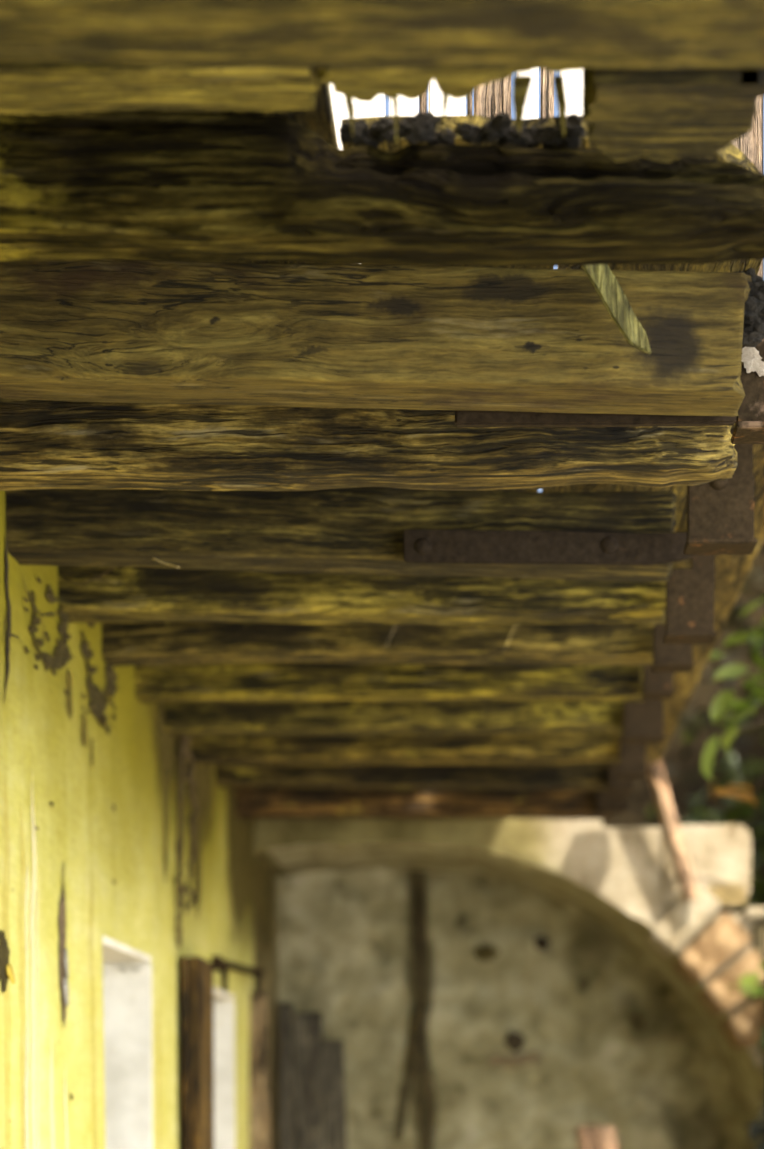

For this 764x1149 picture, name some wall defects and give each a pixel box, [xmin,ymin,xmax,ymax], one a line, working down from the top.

peeling [23,577,119,734]